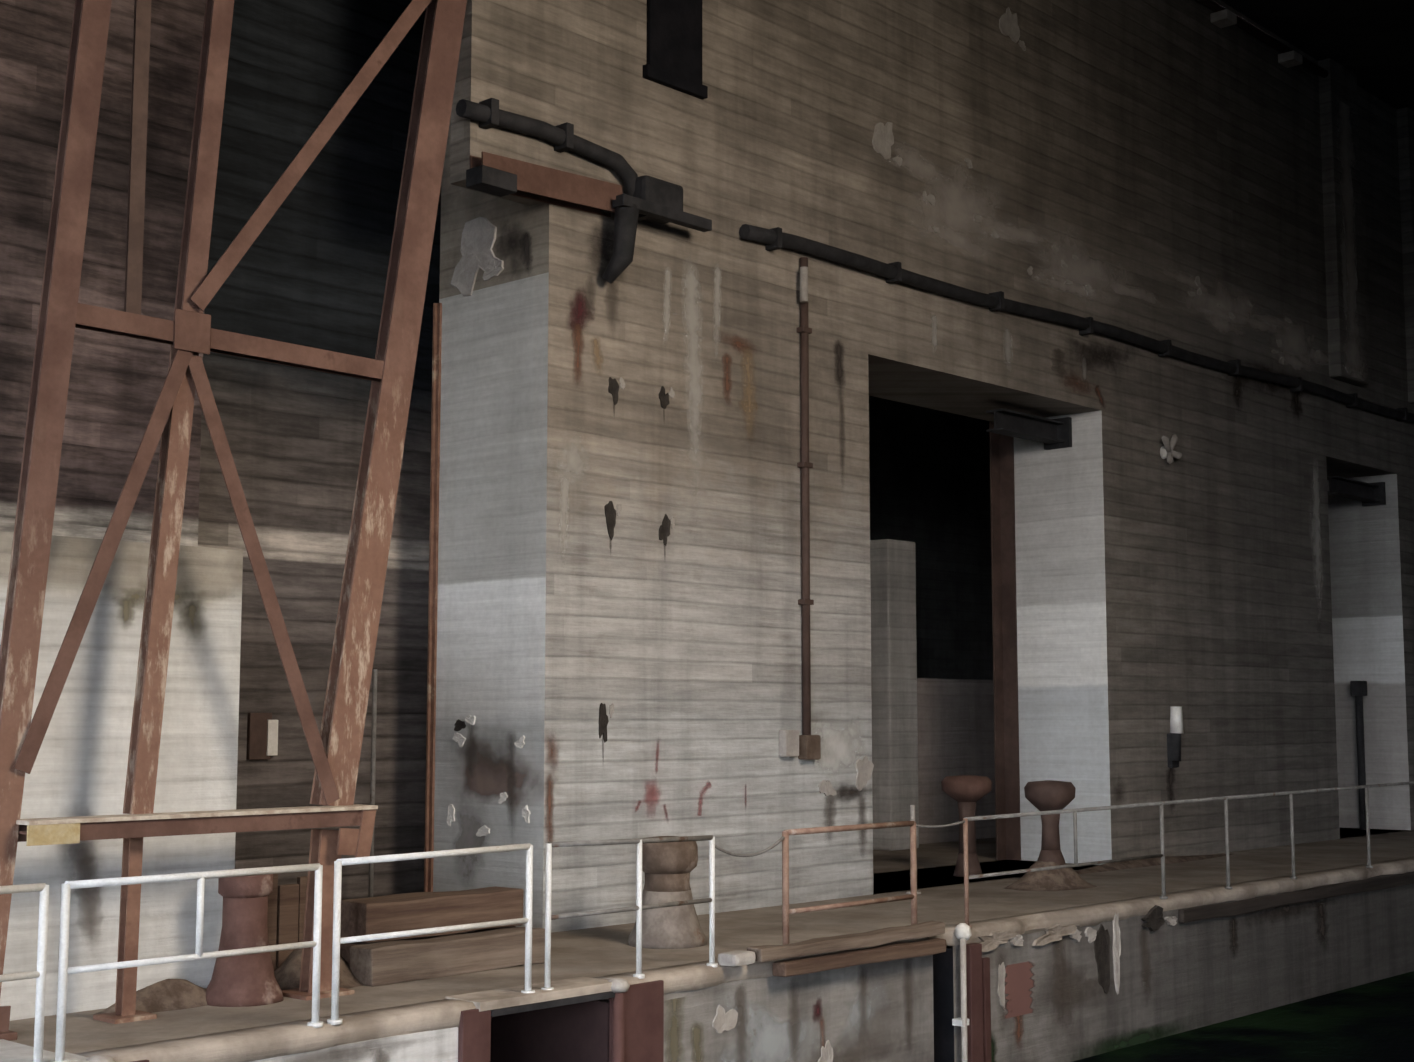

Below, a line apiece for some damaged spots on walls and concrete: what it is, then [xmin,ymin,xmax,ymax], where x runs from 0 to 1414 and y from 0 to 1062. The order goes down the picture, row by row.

peeling [872,122,903,166]
peeling [451,217,504,297]
peeling [987,220,1153,302]
rust [570,292,601,380]
damp [686,273,700,441]
rust [723,336,753,422]
peeling [712,1005,800,1062]
peeling [818,1040,833,1062]